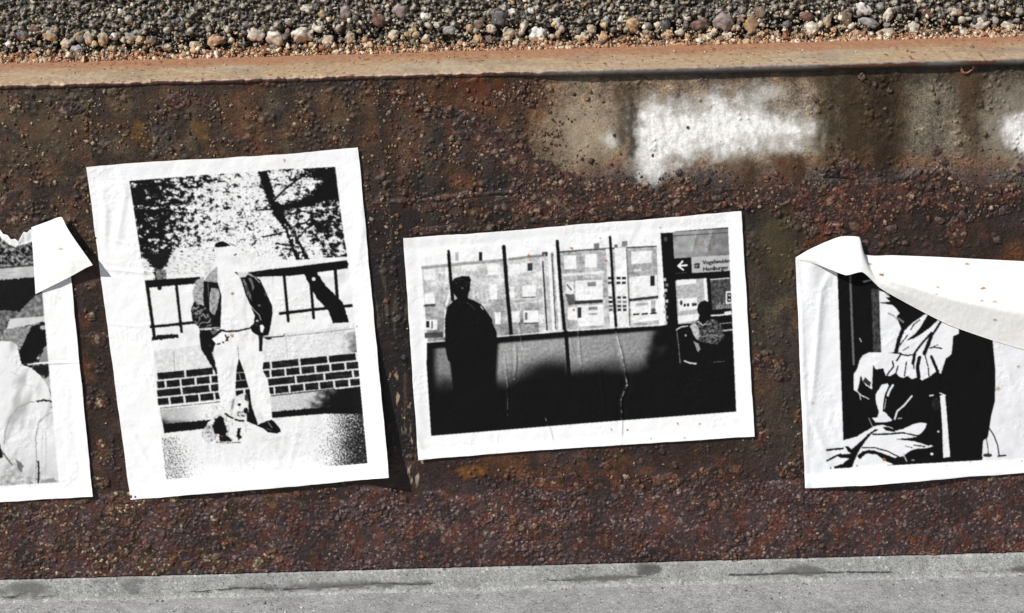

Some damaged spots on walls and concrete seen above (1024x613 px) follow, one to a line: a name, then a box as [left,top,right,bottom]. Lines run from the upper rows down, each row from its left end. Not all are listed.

rust [807,72,900,118]
leakage [633,86,814,178]
leakage [989,99,1024,152]
rust [0,80,1024,257]
rust [83,310,109,347]
rust [750,353,800,389]
rust [95,391,109,409]
rust [0,416,1024,579]